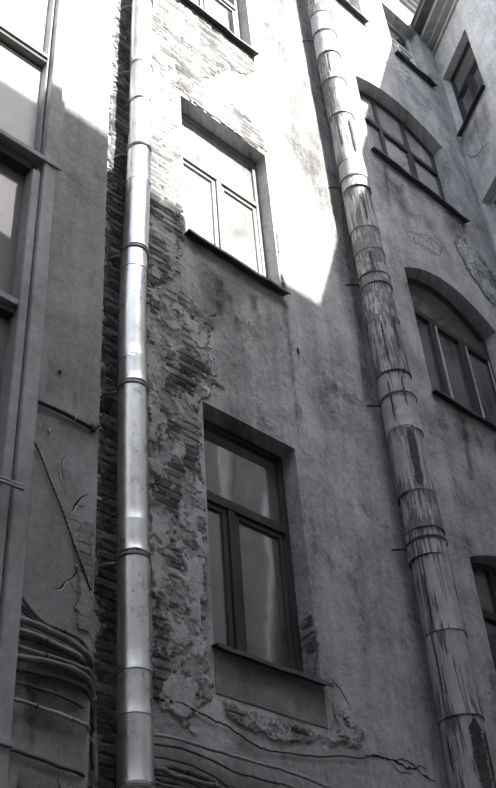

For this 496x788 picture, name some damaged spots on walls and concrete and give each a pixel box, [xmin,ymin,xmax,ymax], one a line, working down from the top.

flaking render [275,230,288,296]
flaking render [455,235,496,306]
flaking render [69,0,132,788]
flaking render [146,0,268,733]
crack [68,492,91,527]
crack [52,571,79,593]
flaking render [299,608,319,678]
flaking render [222,702,369,750]
crack [364,754,436,782]